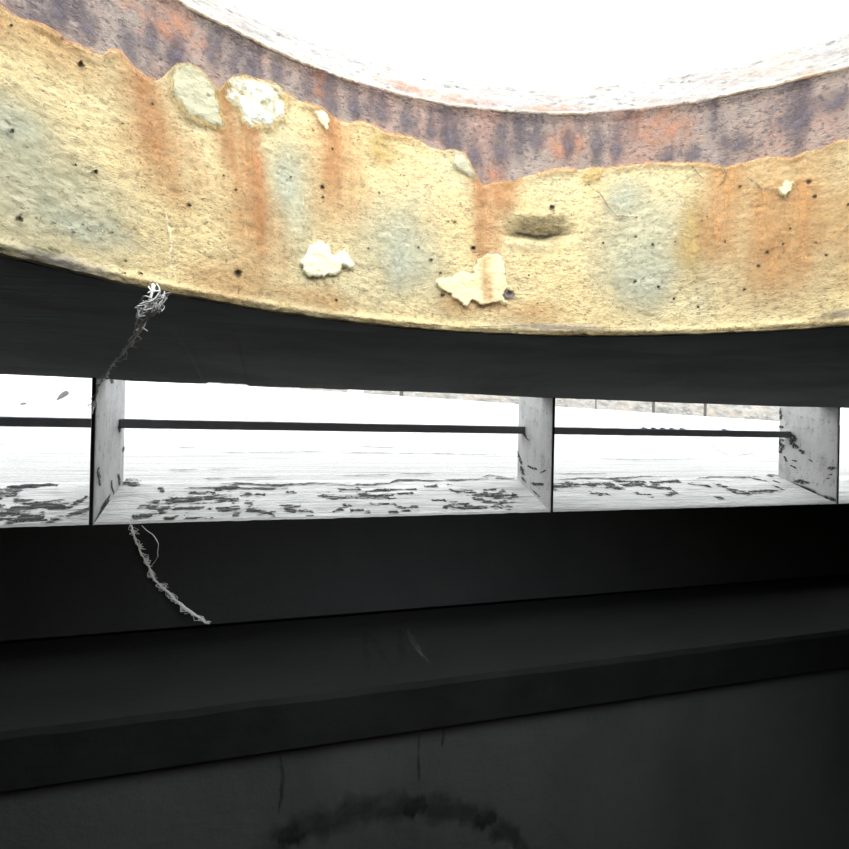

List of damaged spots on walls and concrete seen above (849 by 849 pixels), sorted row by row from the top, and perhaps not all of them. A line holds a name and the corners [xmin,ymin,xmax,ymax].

rust [30,20,91,51]
peeling [171,63,288,128]
peeling [777,180,794,198]
peeling [300,241,355,276]
peeling [436,246,515,307]